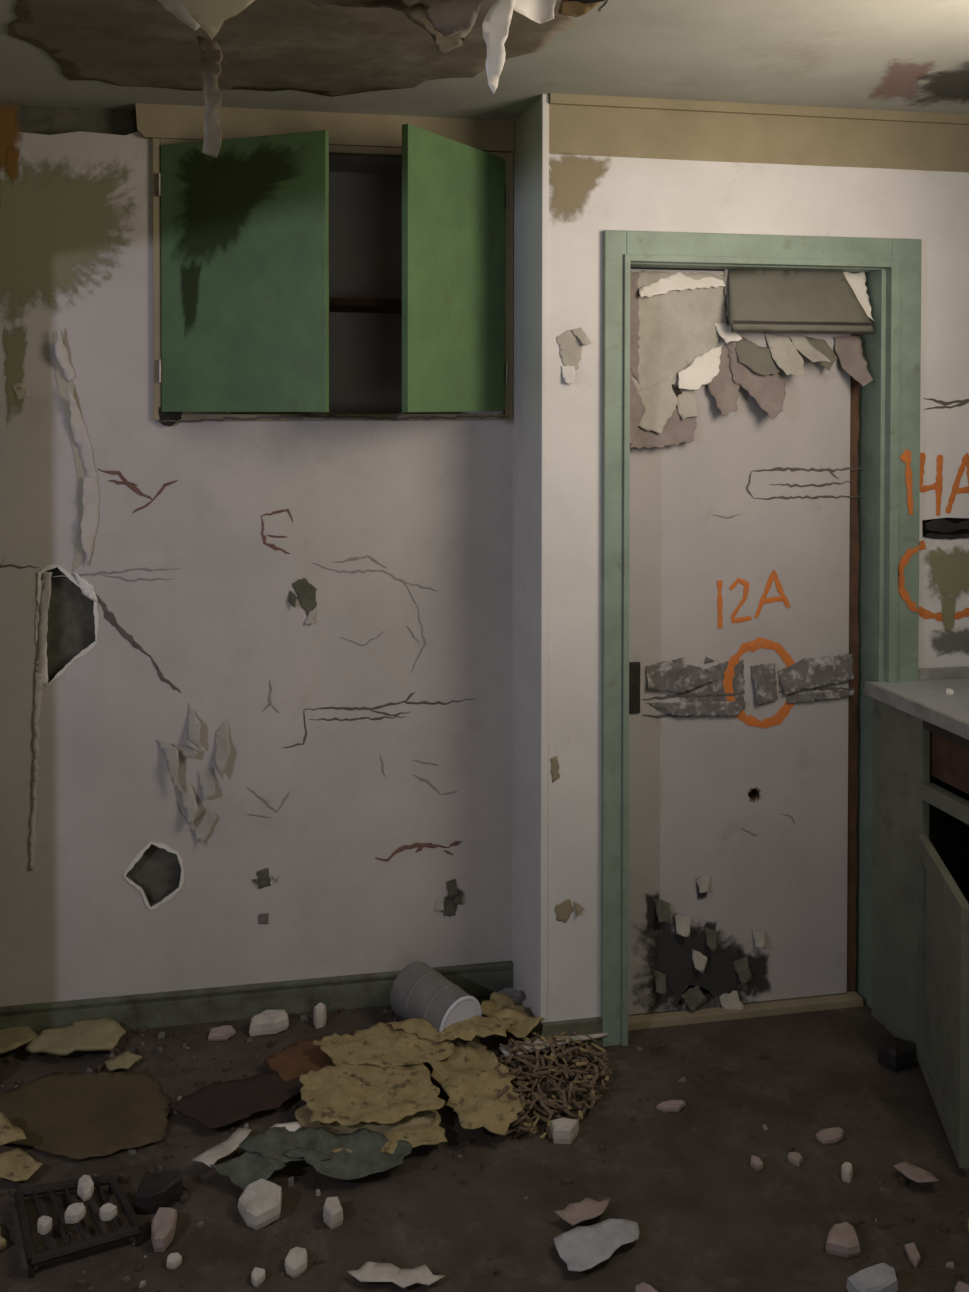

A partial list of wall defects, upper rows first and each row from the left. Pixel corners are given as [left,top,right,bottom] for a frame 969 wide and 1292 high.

corrosion [0,104,20,182]
peeling [8,0,605,158]
damp [872,65,969,103]
damp [0,161,134,421]
peeling [630,269,874,449]
crack [97,469,178,513]
crack [714,467,862,519]
peeling [28,328,100,870]
crack [0,559,181,693]
crack [261,509,474,748]
damp [926,547,969,654]
flaking render [123,841,185,910]